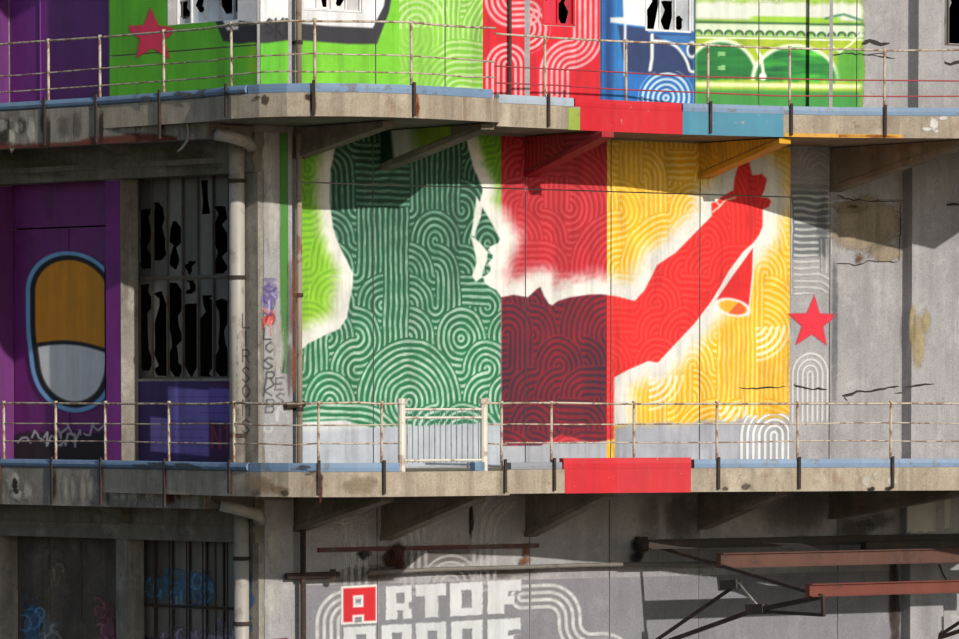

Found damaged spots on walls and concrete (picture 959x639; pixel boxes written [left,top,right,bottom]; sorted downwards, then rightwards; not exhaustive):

corrosion [0,133,177,149]
water stain [910,306,930,365]
crack [739,383,932,401]
corrosion [385,542,406,569]
water stain [889,564,898,581]
water stain [889,594,900,639]